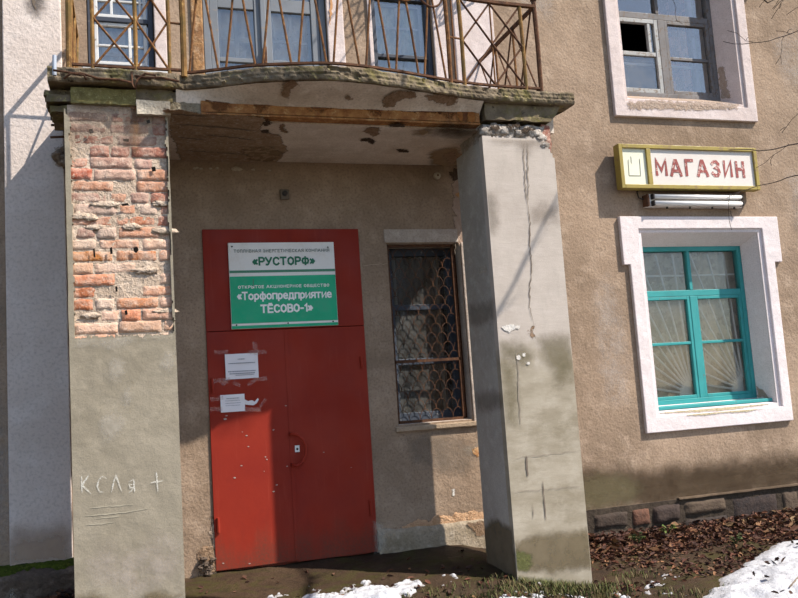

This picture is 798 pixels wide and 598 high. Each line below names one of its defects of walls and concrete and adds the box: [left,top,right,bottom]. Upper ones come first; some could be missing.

corrosion [205,99,230,112]
flaking render [281,80,301,98]
flaking render [360,123,405,144]
flaking render [382,90,458,108]
corrosion [408,111,476,123]
spalling [460,121,552,154]
peeling [627,66,739,112]
flaking render [51,108,290,339]
crack [516,143,535,426]
leakage [583,458,798,505]
spalling [393,510,485,537]
leakage [484,520,591,587]